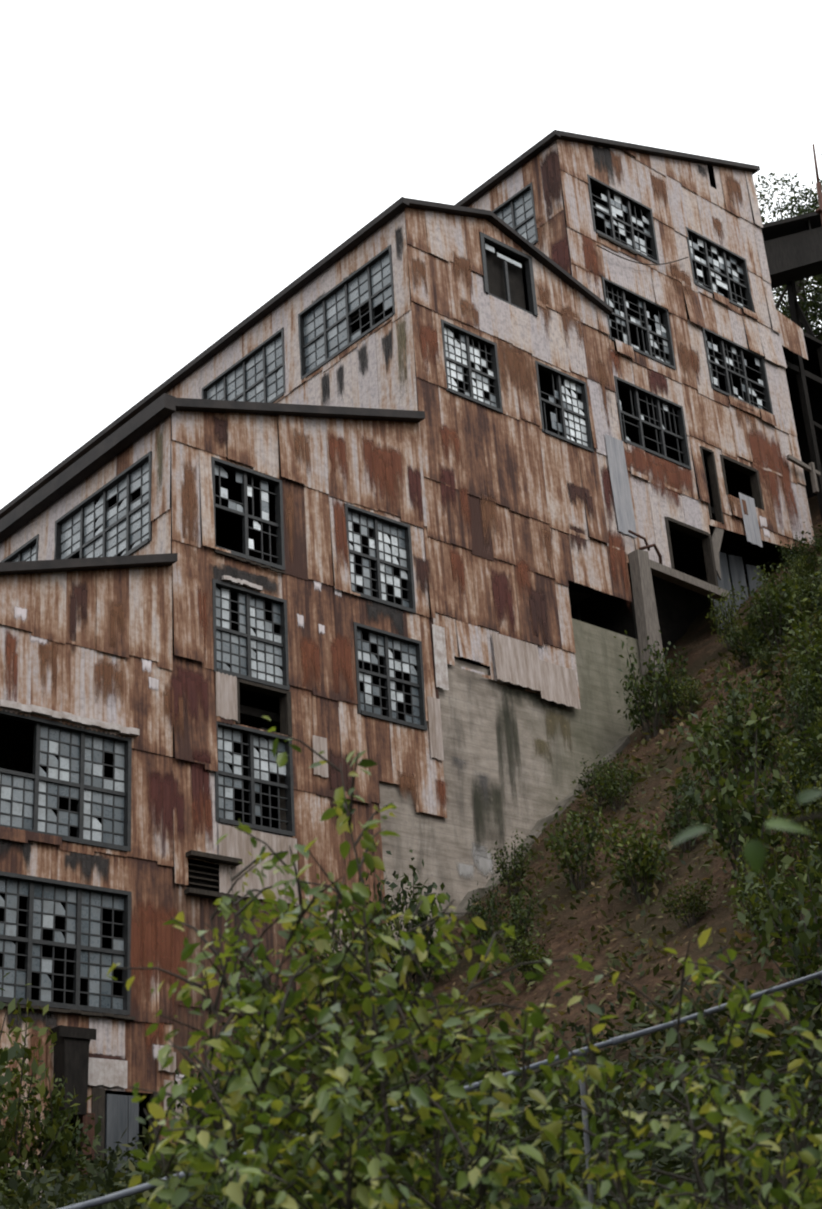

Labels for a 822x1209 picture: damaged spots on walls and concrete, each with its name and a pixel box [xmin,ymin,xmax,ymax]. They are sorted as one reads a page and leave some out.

corrosion [536,151,599,284]
corrosion [650,173,668,202]
corrosion [328,436,348,485]
corrosion [363,436,423,522]
corrosion [333,499,349,570]
corrosion [414,556,430,590]
corrosion [6,631,18,702]
corrosion [41,582,87,685]
corrosion [94,660,123,697]
leakage [497,687,566,771]
corrosion [148,750,213,857]
leakage [473,776,501,828]